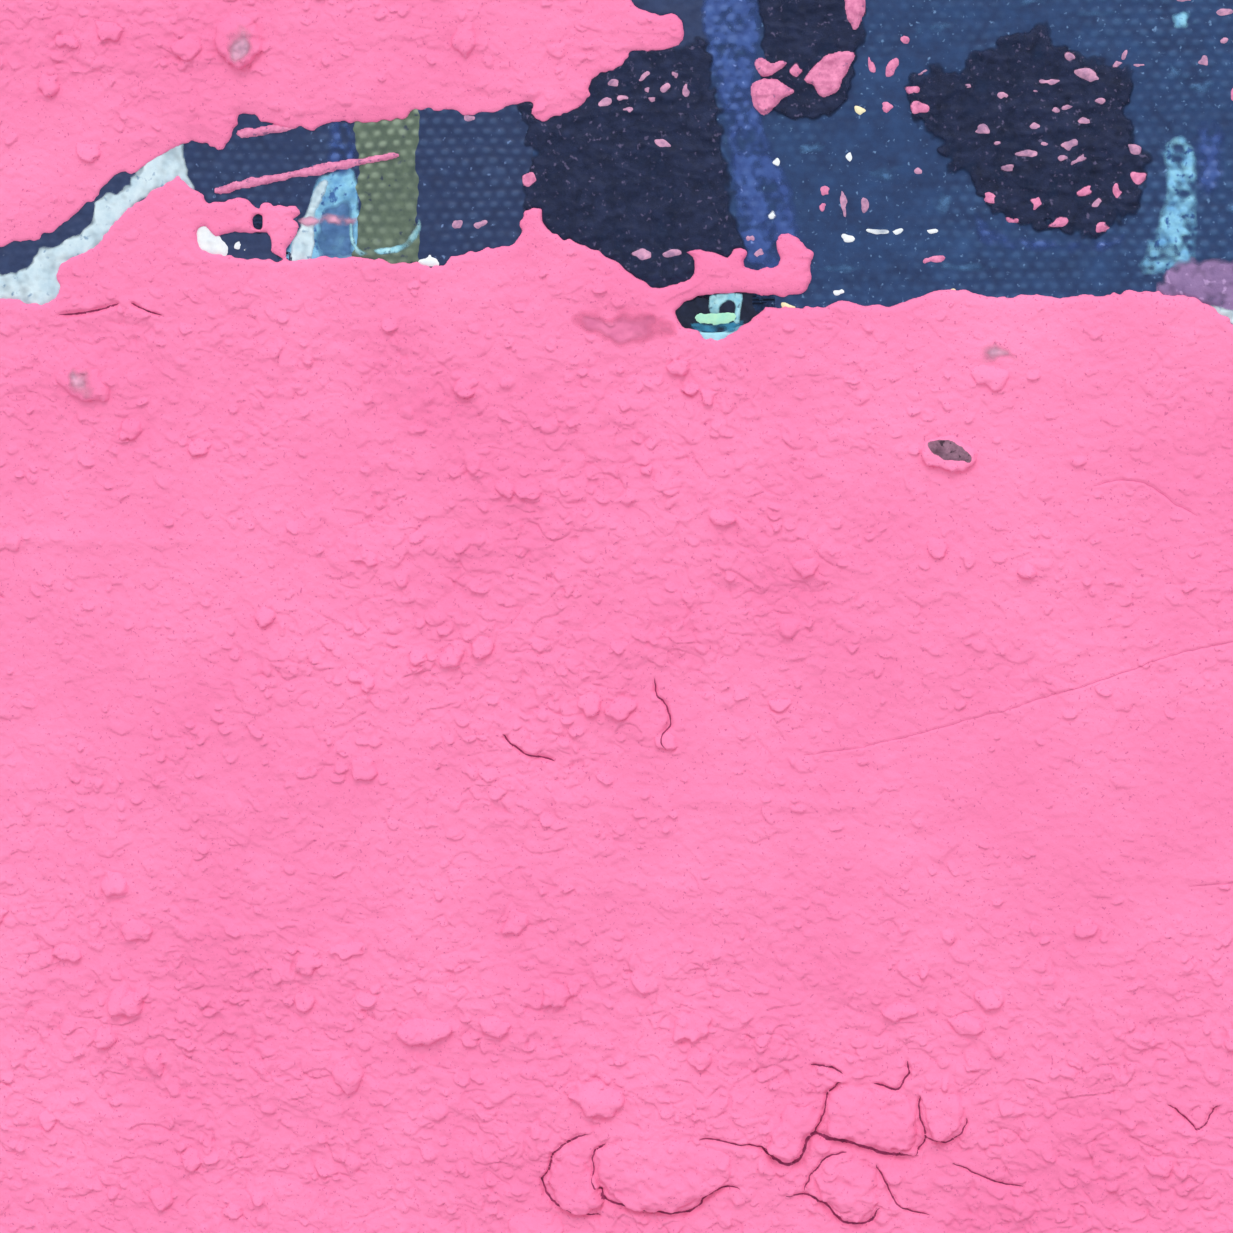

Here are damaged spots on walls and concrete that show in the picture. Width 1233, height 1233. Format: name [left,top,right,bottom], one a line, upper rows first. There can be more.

peeling [0,0,1233,340]
crack [541,1134,739,1215]
crack [700,1061,1020,1224]